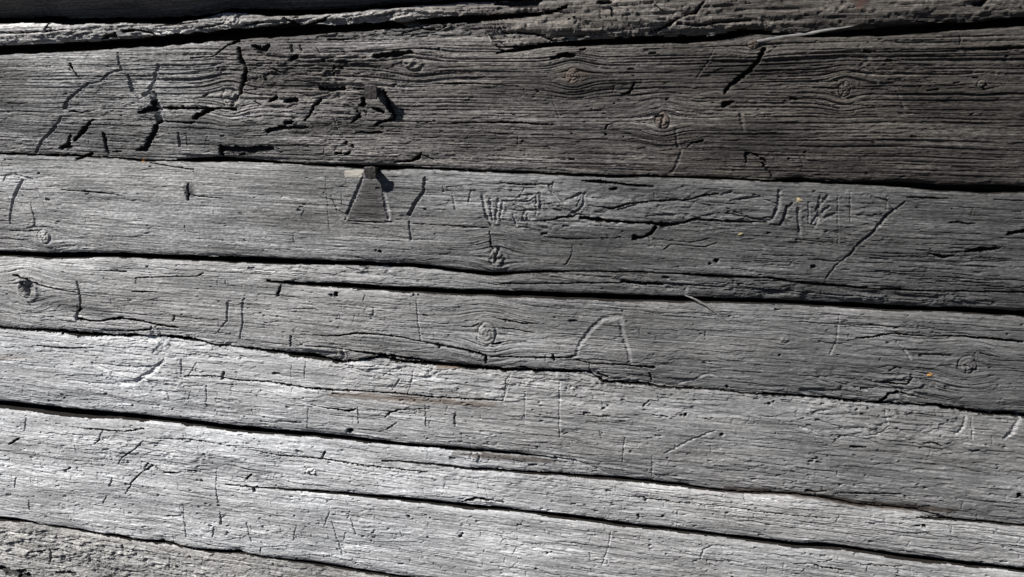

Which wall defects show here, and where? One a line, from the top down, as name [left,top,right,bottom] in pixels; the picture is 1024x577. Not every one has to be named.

crack [72,14,360,125]
crack [403,25,447,50]
crack [724,47,766,94]
crack [541,180,767,249]